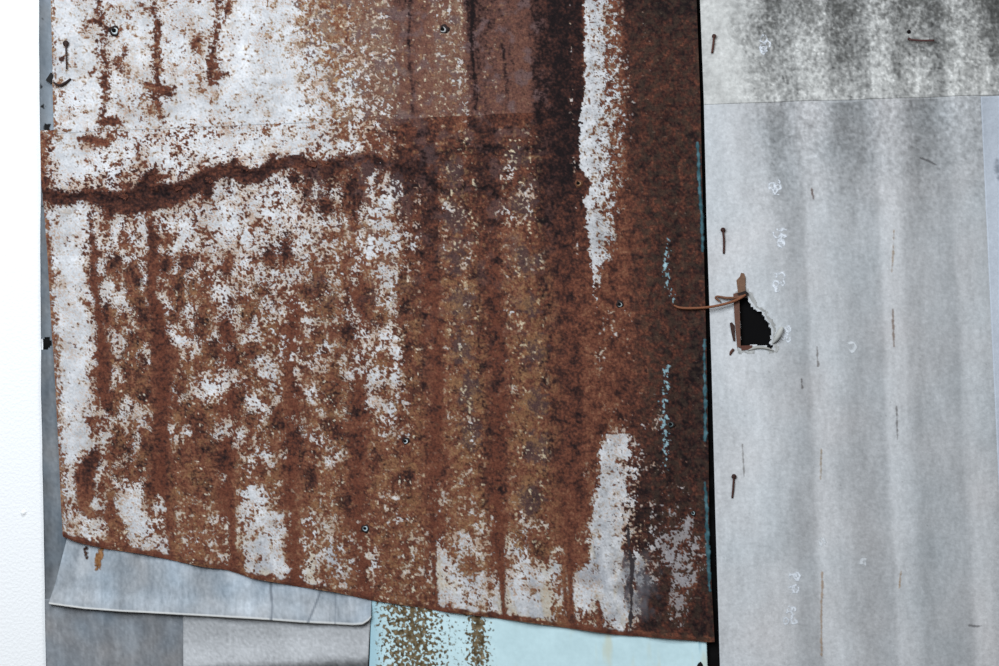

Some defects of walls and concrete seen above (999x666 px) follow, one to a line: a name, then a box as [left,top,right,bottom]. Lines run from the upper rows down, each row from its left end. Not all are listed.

corrosion [40,0,715,666]
spalling [735,288,784,354]